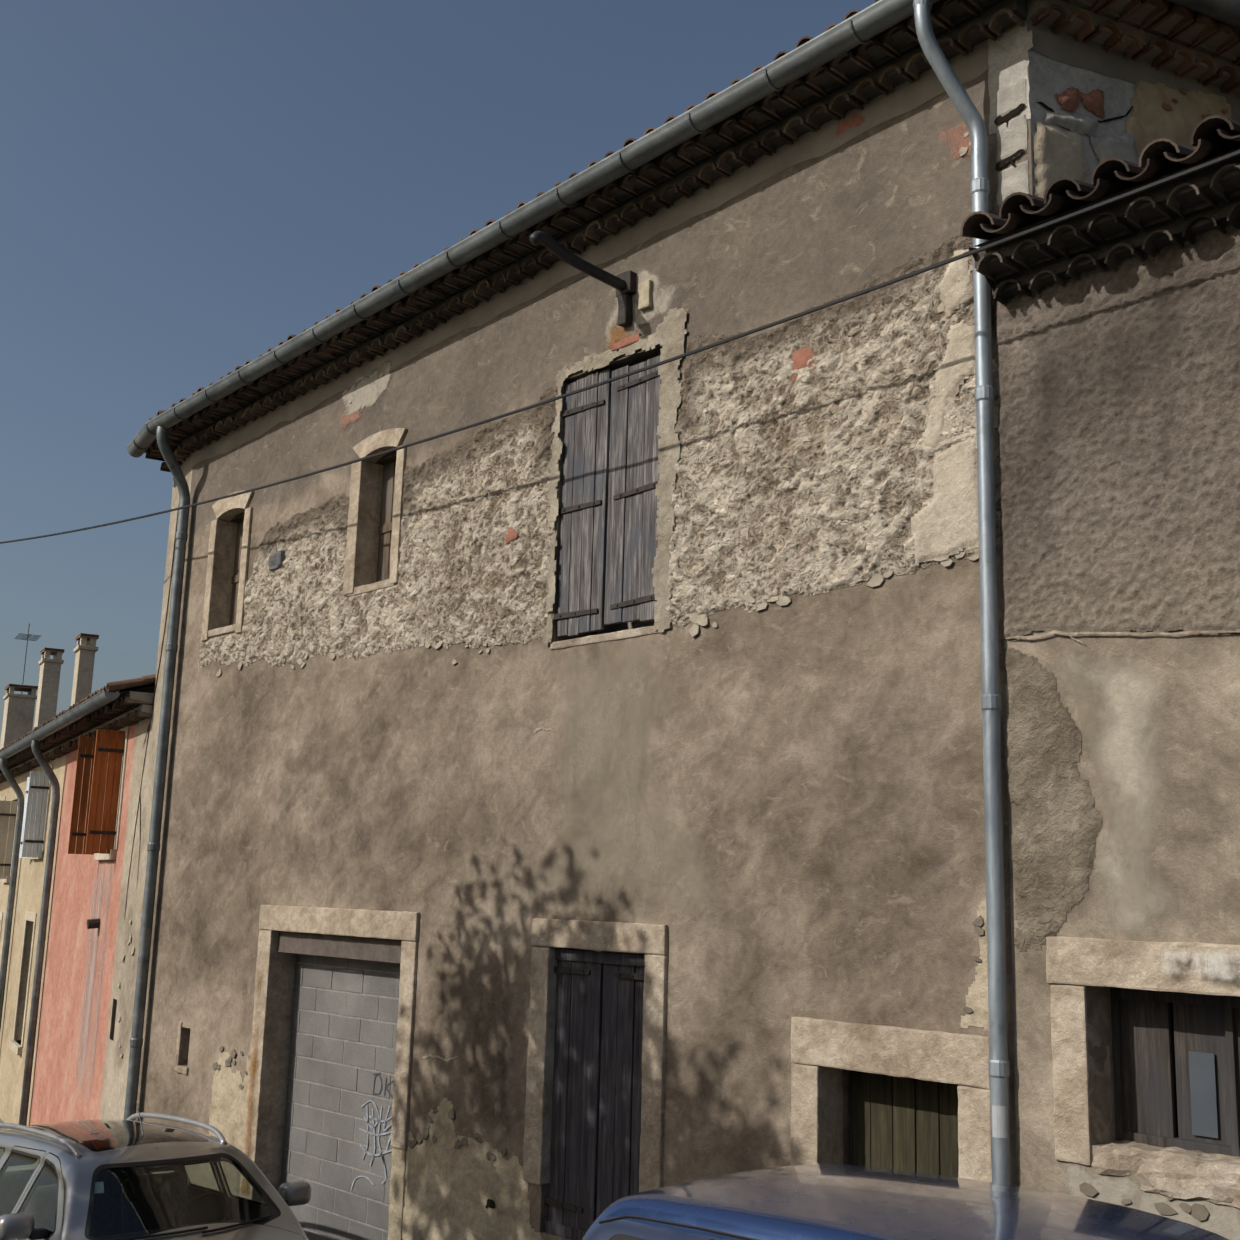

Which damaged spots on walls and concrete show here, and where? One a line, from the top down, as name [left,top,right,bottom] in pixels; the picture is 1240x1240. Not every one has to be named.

flaking render [1033,80,1231,198]
flaking render [606,271,675,343]
flaking render [341,362,391,426]
flaking render [665,235,979,638]
flaking render [991,288,1002,548]
flaking render [198,387,558,677]
crack [1005,629,1240,643]
flaking render [402,1097,543,1240]